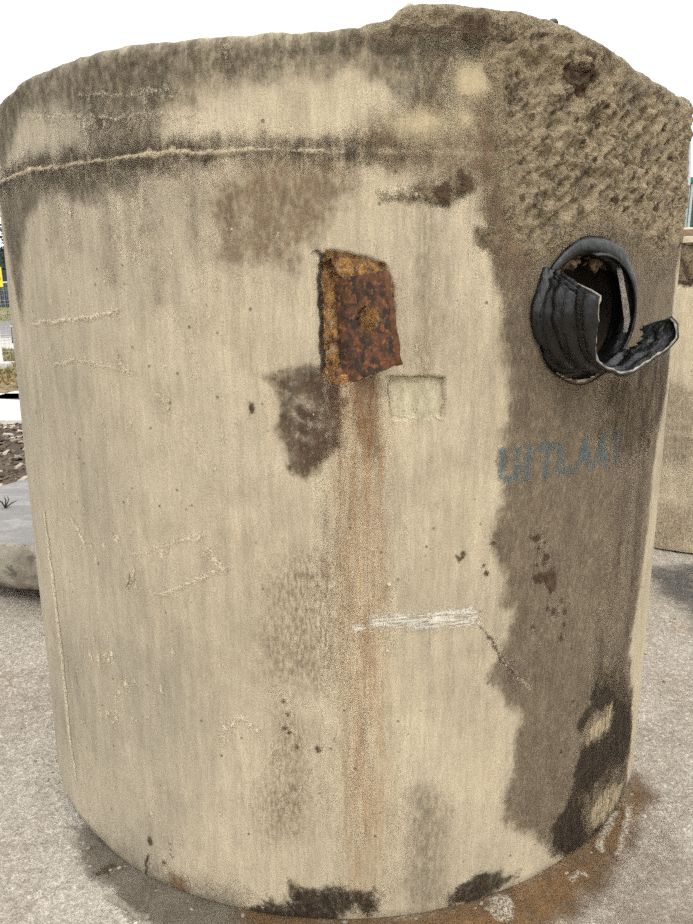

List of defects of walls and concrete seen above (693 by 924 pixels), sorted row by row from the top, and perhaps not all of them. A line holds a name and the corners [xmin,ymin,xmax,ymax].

leakage [0,6,498,310]
corrosion [320,250,390,388]
leakage [213,88,693,858]
crack [476,619,531,690]
leakage [73,827,382,924]
leakage [411,793,520,921]